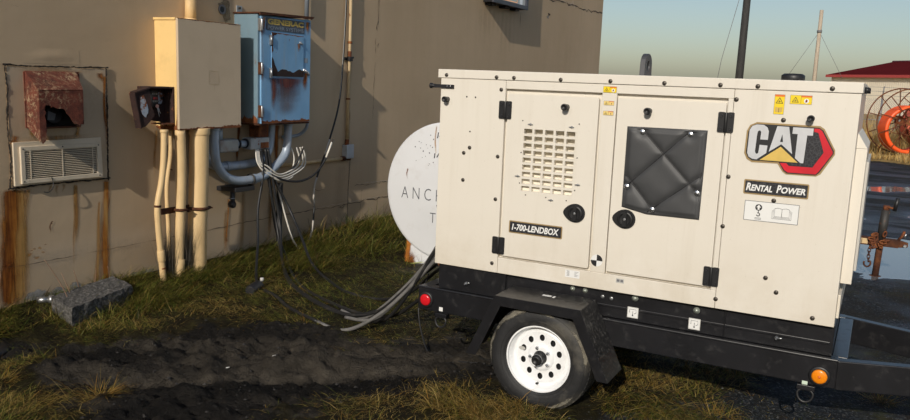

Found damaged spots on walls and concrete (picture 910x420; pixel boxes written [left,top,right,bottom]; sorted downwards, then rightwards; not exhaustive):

crack [551,0,602,13]
rust [1,190,46,305]
rust [94,181,109,280]